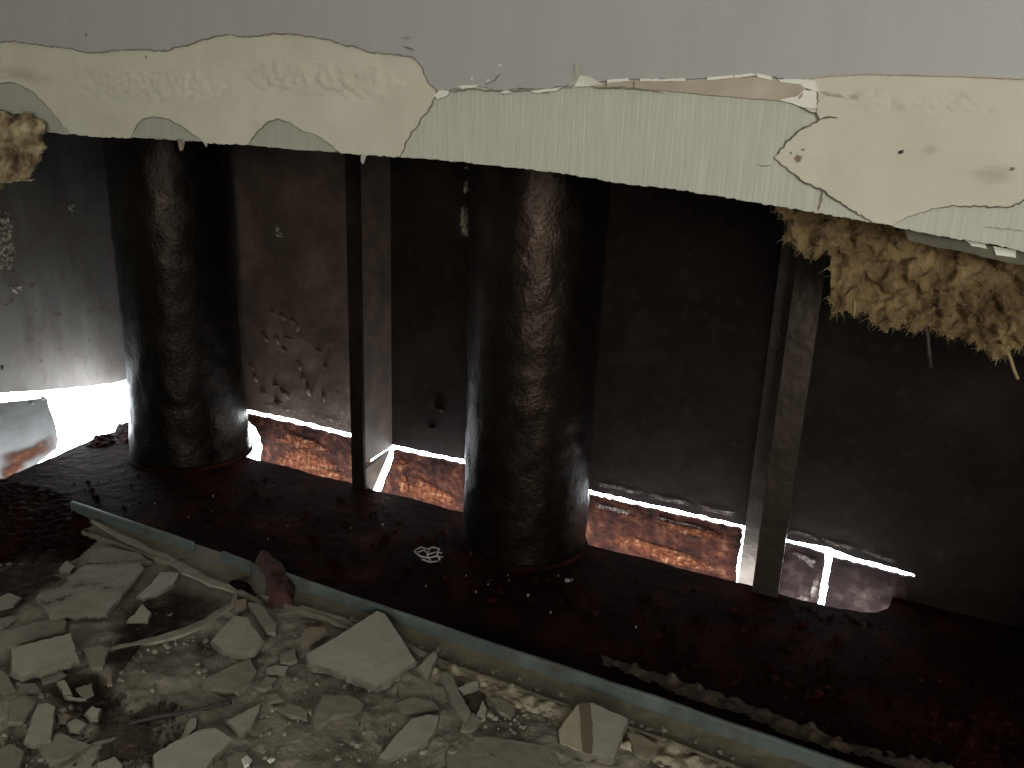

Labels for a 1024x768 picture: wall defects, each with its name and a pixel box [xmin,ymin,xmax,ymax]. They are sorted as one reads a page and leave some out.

flaking render [0,32,437,157]
peeling [574,63,603,87]
crack [758,92,1024,226]
rust [276,433,341,480]
rust [396,459,455,507]
rust [614,536,711,571]
rust [658,519,720,541]